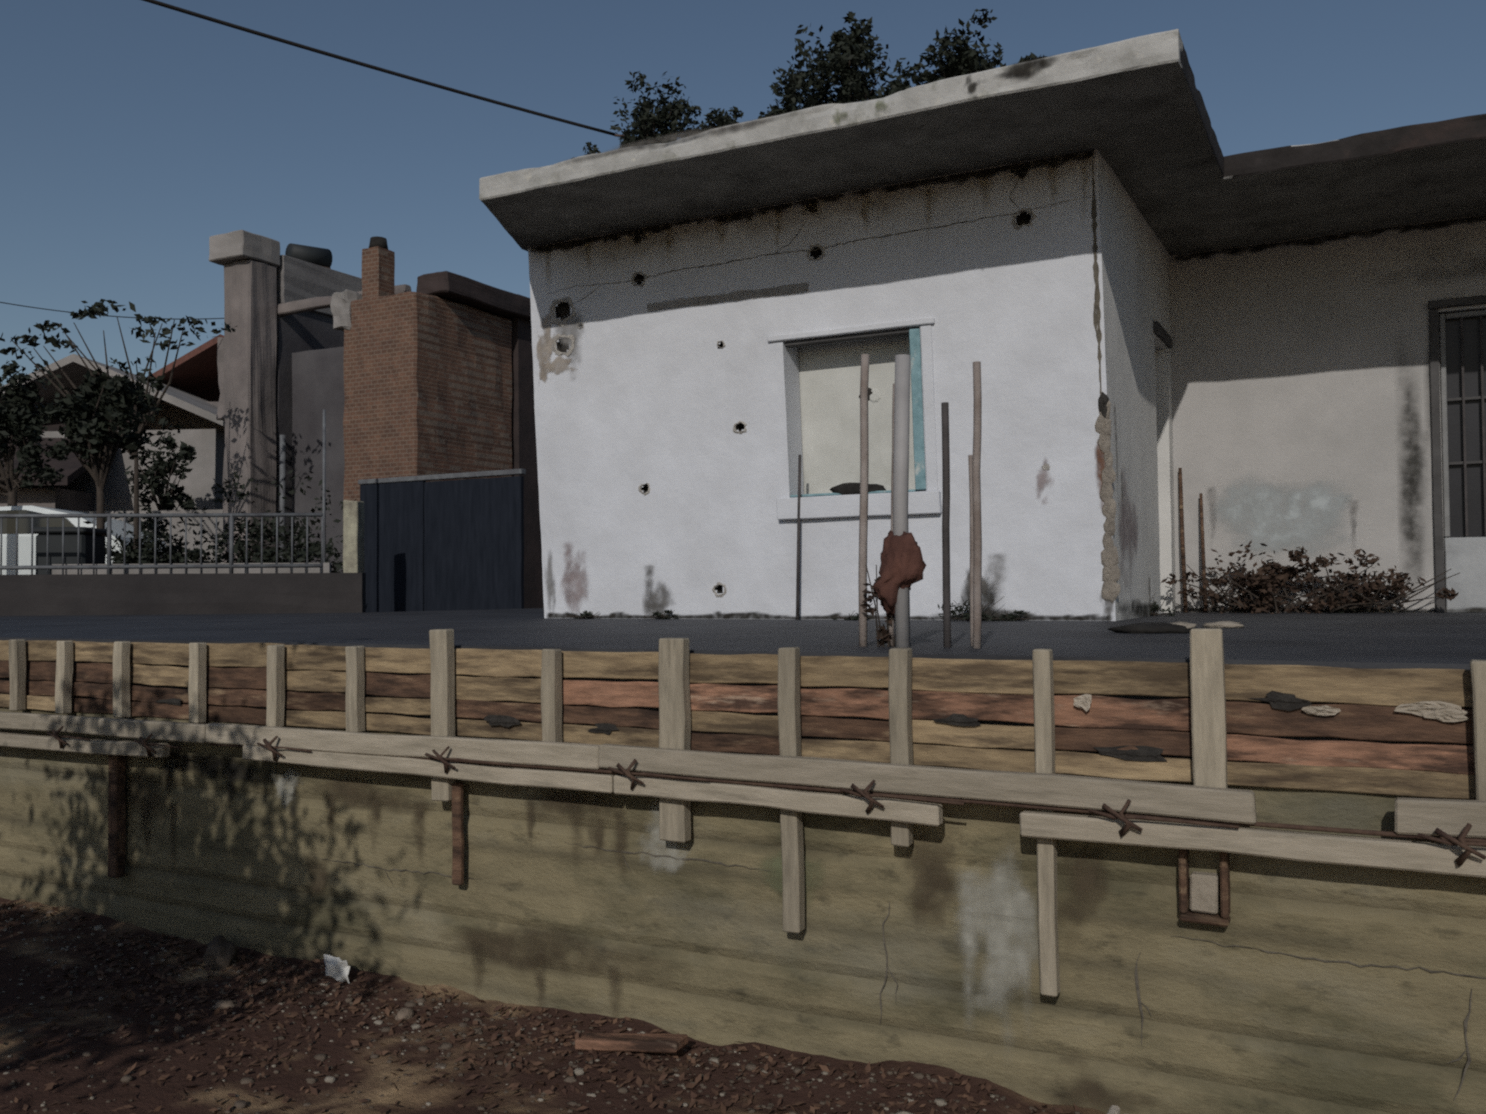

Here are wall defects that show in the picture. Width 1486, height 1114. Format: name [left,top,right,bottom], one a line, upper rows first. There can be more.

spalling [537,297,584,382]
spalling [1095,392,1137,604]
water stain [1403,393,1422,540]
water stain [547,548,849,619]
water stain [966,572,1000,592]
water stain [983,587,1151,620]